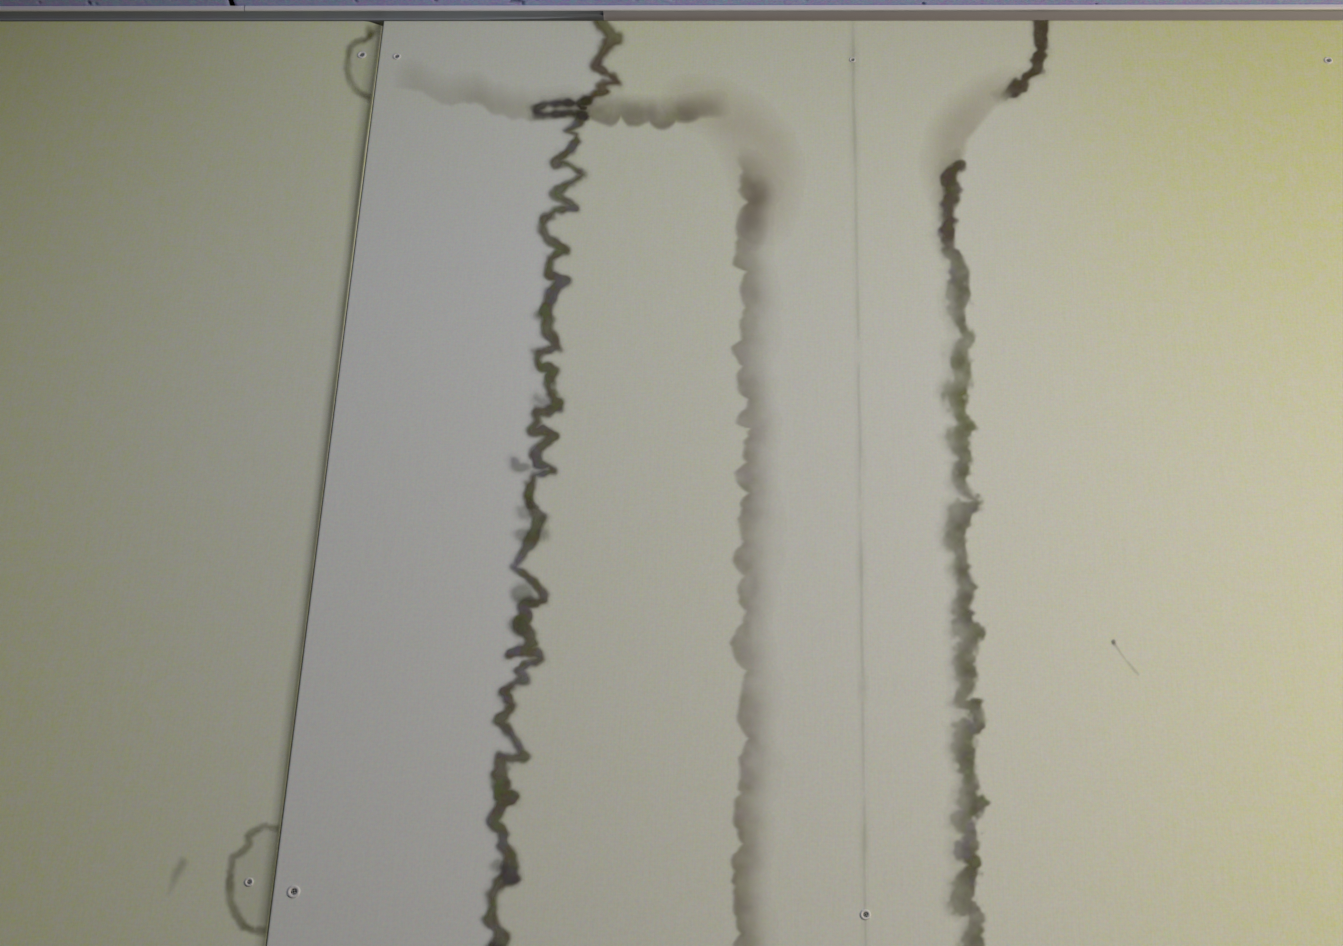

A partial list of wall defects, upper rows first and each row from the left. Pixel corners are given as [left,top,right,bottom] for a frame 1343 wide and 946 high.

water stain [352,88,373,246]
water stain [483,20,622,946]